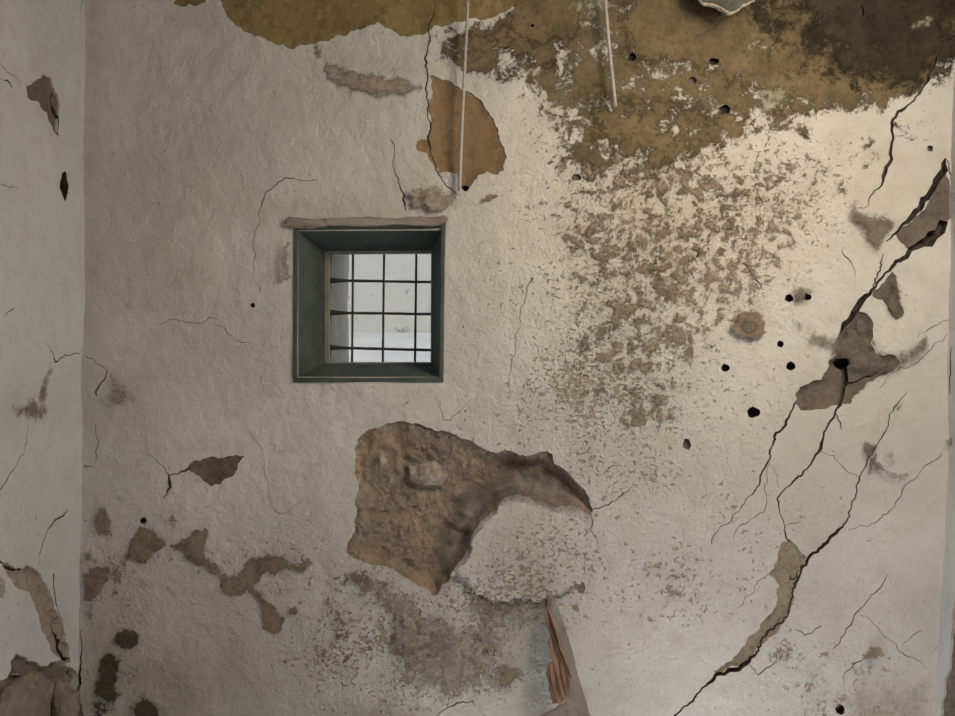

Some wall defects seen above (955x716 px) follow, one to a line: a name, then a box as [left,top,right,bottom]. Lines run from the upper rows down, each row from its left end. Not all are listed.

spalling [220,0,517,191]
crack [391,139,406,211]
crack [424,0,460,196]
flaking render [540,155,825,435]
leakage [617,0,955,115]
spalling [795,312,897,411]
crack [840,158,951,334]
crack [0,510,82,689]
spalling [189,455,244,486]
flaking render [170,528,313,634]
spalling [318,421,593,704]
crack [674,320,952,716]